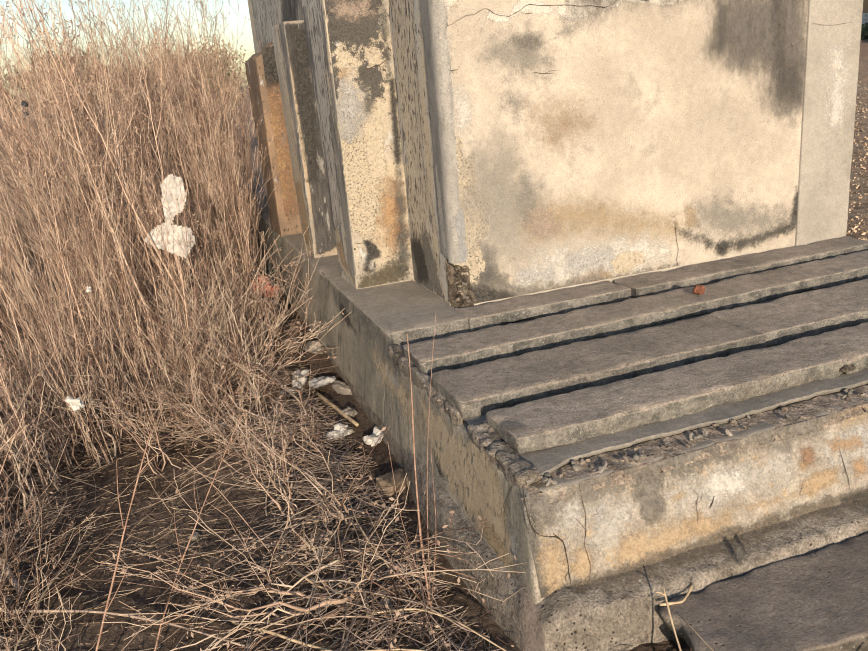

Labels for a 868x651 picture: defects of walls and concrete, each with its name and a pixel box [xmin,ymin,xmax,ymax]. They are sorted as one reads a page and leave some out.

water stain [325,0,400,164]
crack [447,0,687,26]
water stain [711,0,806,112]
peeling [445,88,490,305]
water stain [684,192,798,256]
crack [499,482,605,583]